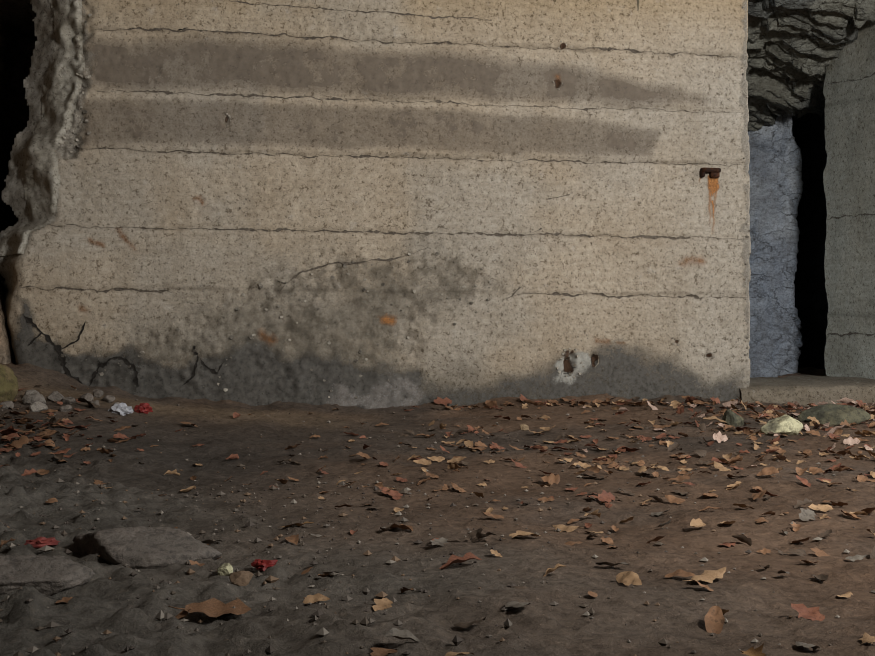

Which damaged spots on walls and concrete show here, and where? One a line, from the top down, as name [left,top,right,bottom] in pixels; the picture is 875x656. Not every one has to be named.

rust [708,177,719,218]
leakage [13,301,739,409]
spalling [555,348,599,384]